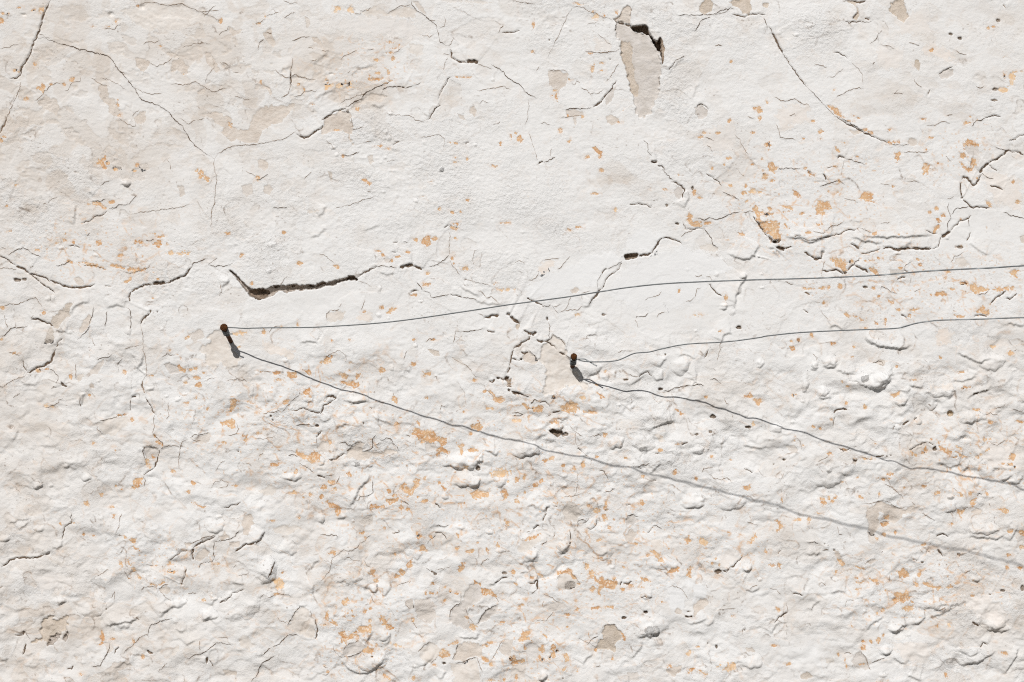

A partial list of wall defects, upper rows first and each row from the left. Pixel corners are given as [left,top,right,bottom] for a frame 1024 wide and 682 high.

peeling [592,5,665,118]
peeling [980,167,1024,213]
crack [0,1,632,486]
spalling [230,270,358,300]
peeling [524,227,736,313]
crack [326,0,1023,544]
peeling [188,329,242,370]
peeling [520,335,588,396]
peeling [977,439,1024,472]
peeling [31,615,69,646]
peeling [596,616,627,652]
peeling [442,641,483,682]